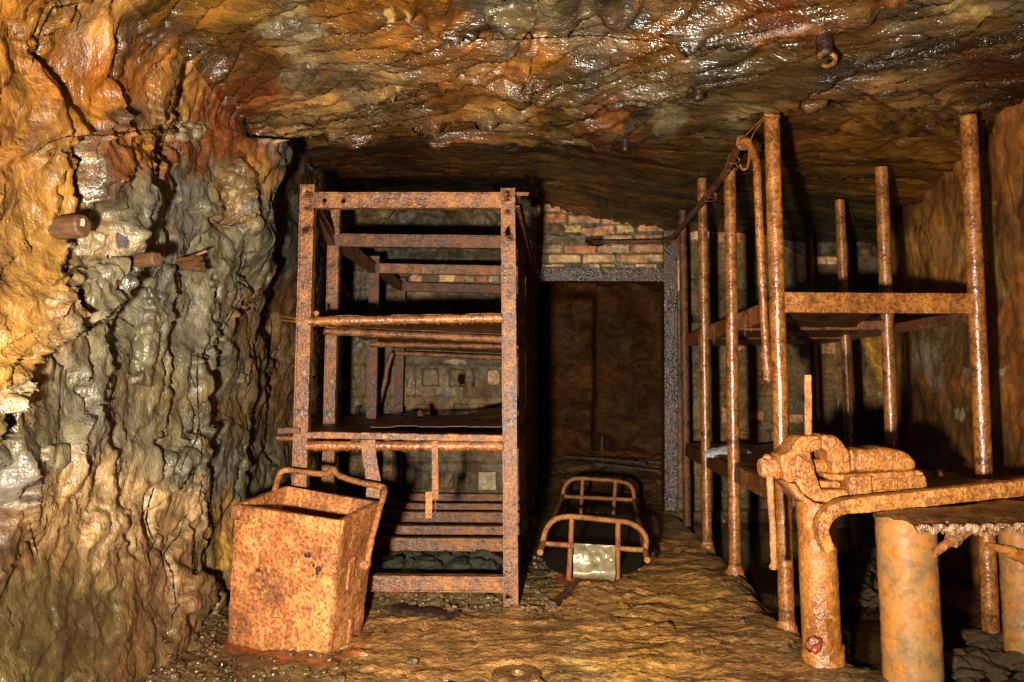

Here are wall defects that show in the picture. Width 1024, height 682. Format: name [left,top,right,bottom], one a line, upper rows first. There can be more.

crack [76,304,134,338]
crack [181,255,247,470]
crack [145,488,198,636]